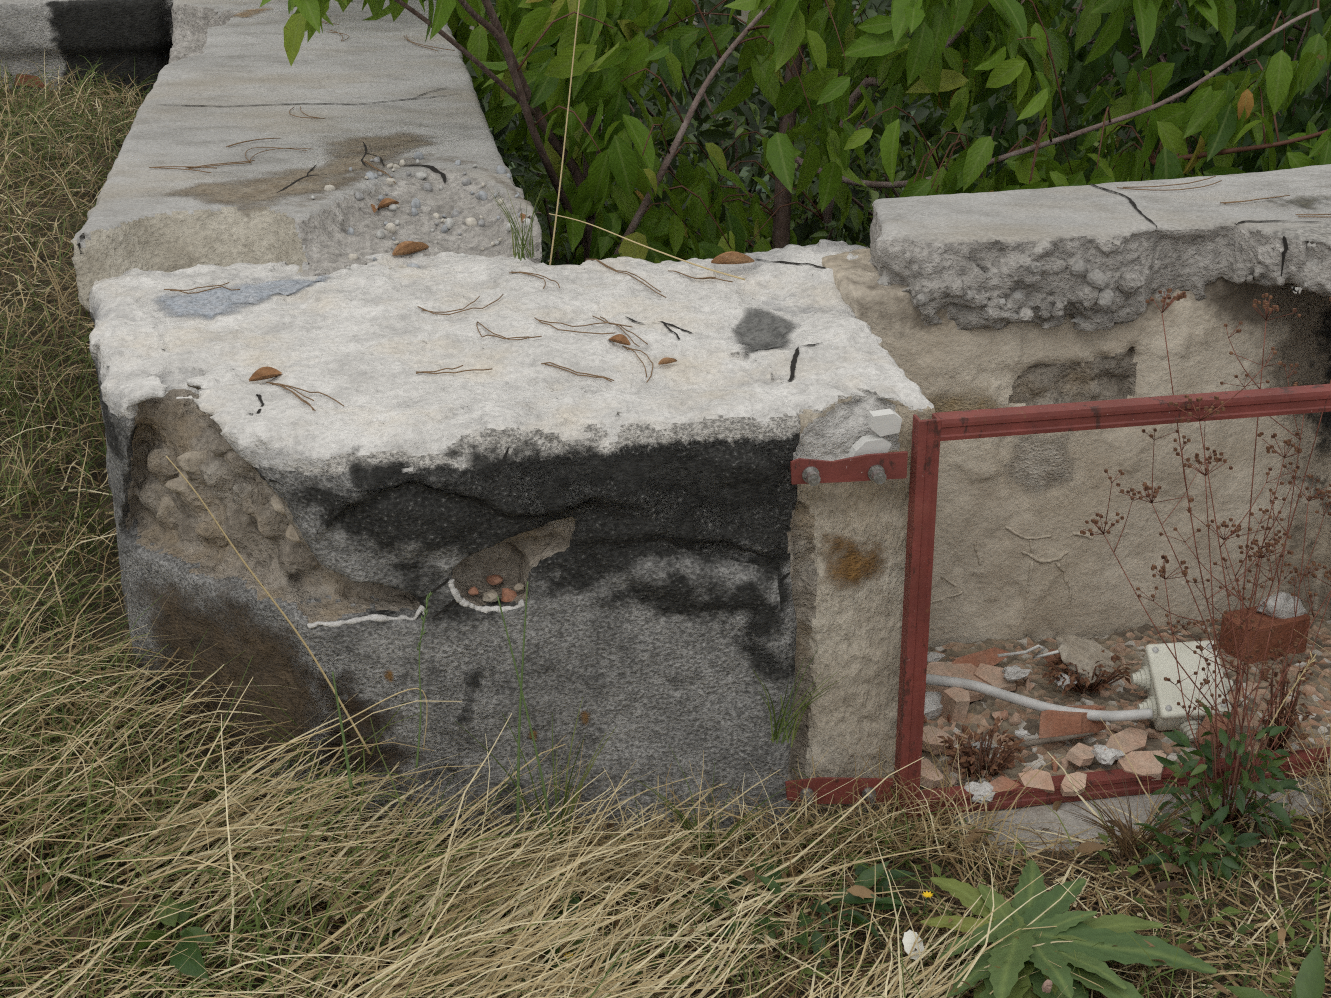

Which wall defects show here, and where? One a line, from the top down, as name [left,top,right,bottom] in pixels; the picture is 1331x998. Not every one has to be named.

crack [1090,183,1157,227]
spalling [70,168,1331,629]
crack [496,447,509,472]
crack [473,501,790,581]
rust [826,537,882,587]